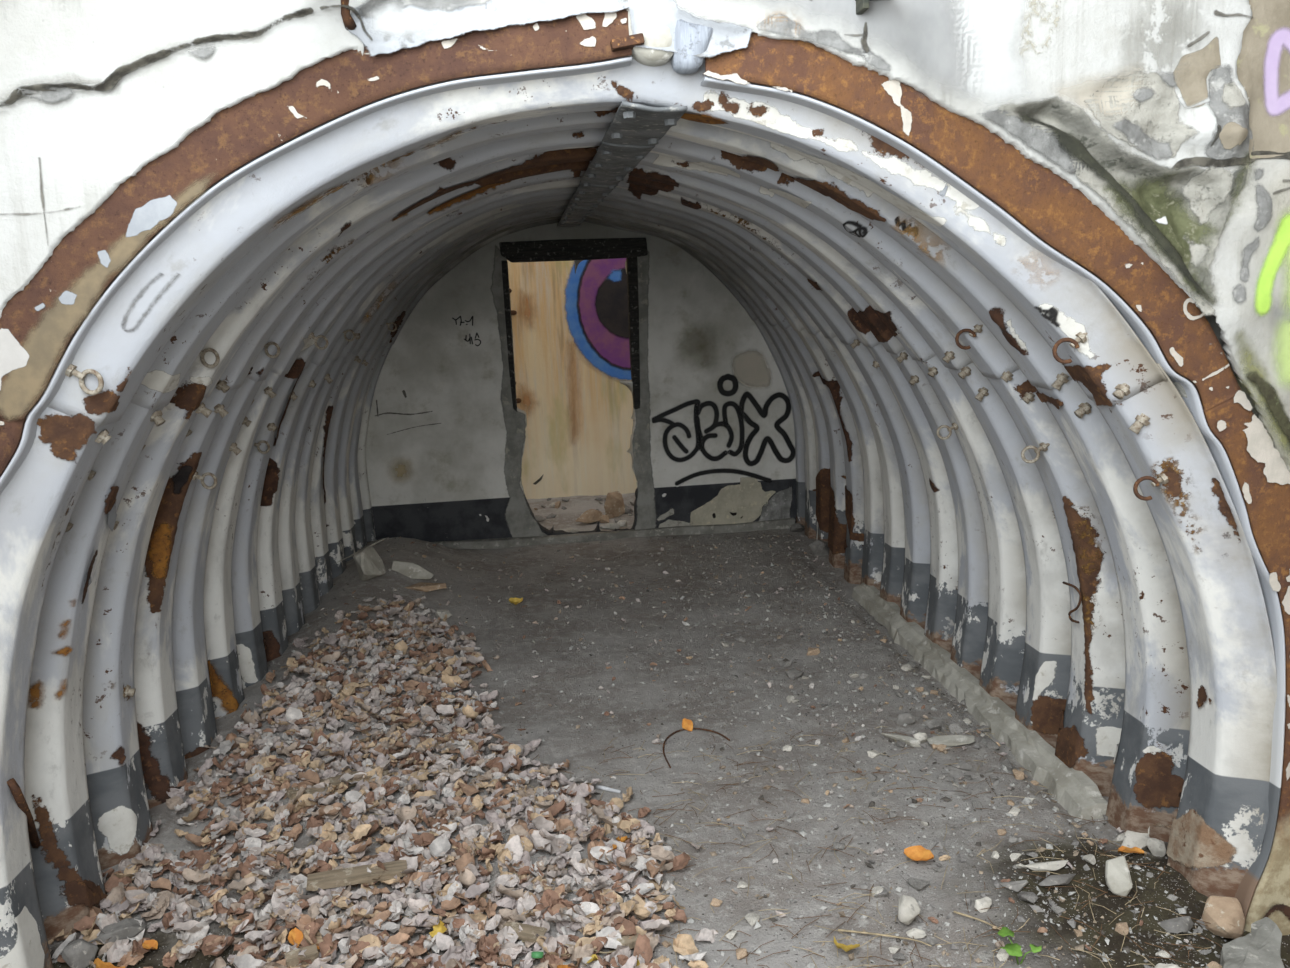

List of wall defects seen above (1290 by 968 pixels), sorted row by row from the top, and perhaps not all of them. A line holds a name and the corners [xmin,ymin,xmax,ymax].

crack [0,5,373,106]
corrosion [681,91,767,124]
corrosion [721,150,886,222]
peeling [703,93,1006,246]
spalling [982,0,1290,315]
peeling [0,179,212,419]
corrosion [37,367,132,464]
corrosion [1063,363,1122,407]
corrosion [145,452,202,613]
corrosion [1062,496,1106,715]
corrosion [1133,752,1236,868]
peeling [0,906,45,968]